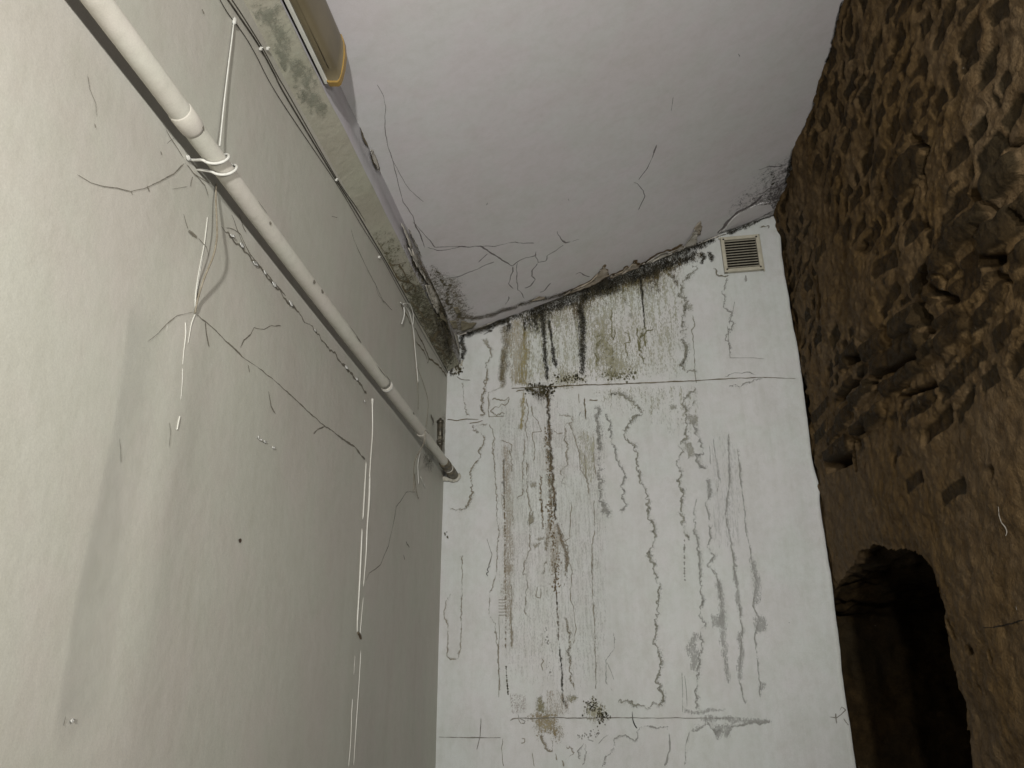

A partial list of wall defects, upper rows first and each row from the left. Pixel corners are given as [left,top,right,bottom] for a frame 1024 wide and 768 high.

leakage [255,4,327,116]
crack [79,132,215,195]
crack [332,85,578,380]
peeling [563,221,726,296]
crack [150,312,365,460]
leakage [375,150,792,766]